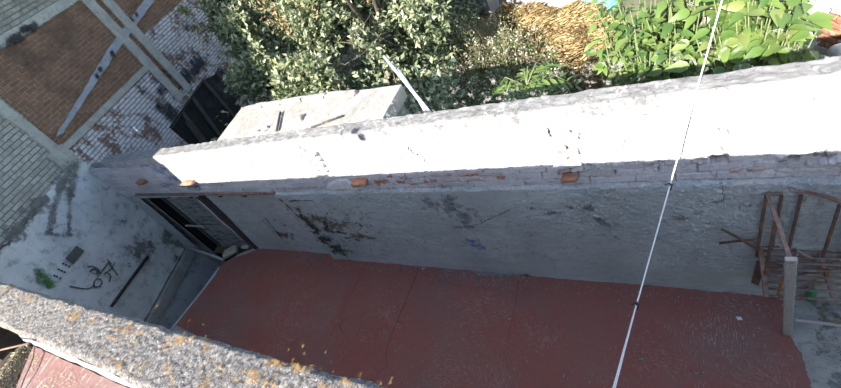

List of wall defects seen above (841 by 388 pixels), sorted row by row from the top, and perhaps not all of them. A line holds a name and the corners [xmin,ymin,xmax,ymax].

leakage [0,21,38,55]
flaking render [550,108,736,173]
spalling [301,151,329,175]
spalling [373,172,505,186]
leakage [297,205,382,256]